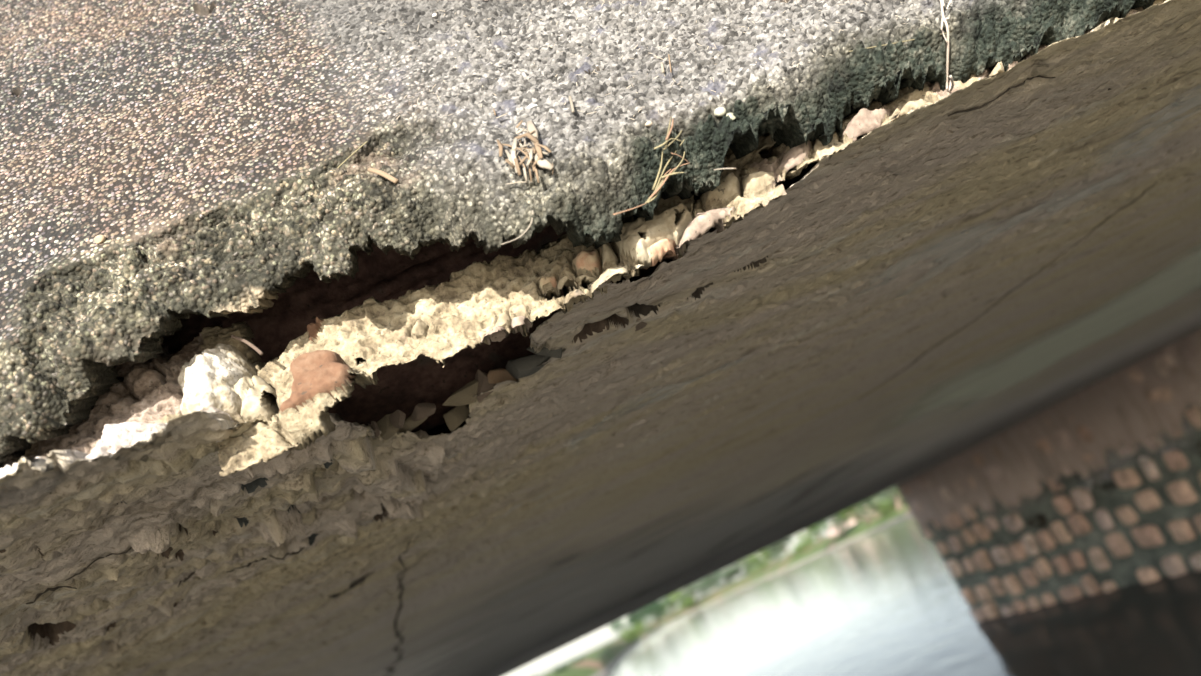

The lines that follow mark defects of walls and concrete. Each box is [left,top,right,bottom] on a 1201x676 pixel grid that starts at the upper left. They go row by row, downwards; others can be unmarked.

spalling [0,0,1166,468]
flaking render [133,285,660,561]
crack [328,536,432,676]